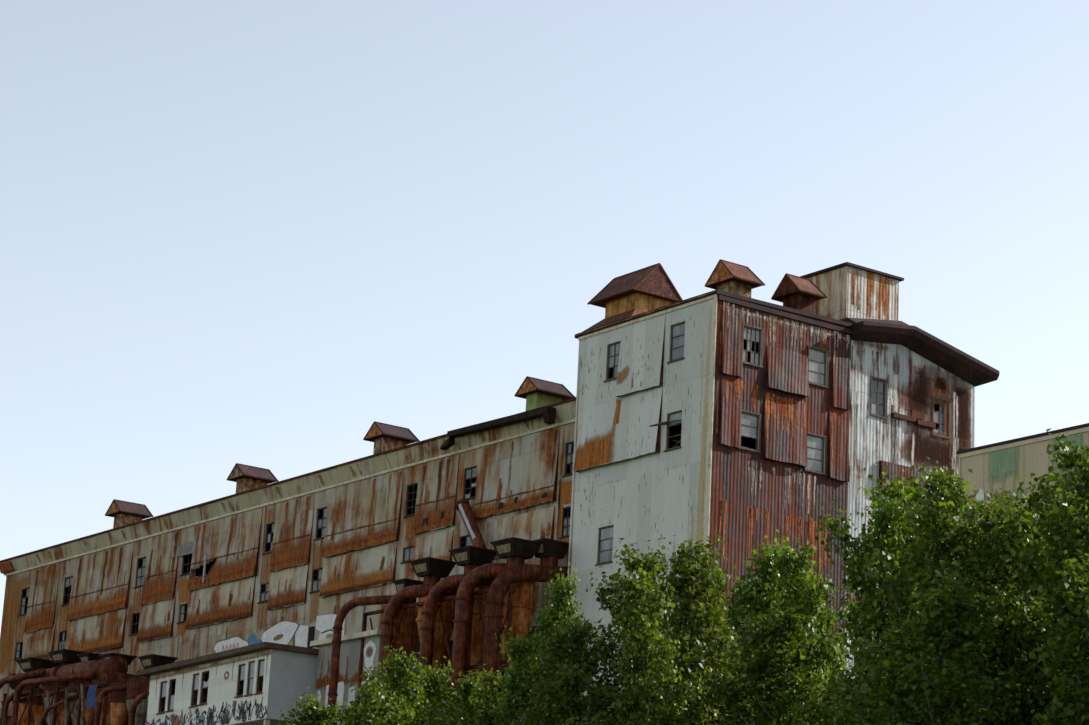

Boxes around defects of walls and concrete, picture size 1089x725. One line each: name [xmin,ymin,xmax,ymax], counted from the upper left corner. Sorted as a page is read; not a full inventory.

rust [851,274,887,315]
rust [716,379,806,443]
rust [830,411,846,459]
damp [888,374,914,465]
rust [473,389,621,575]
rust [0,440,454,673]
rust [719,499,732,555]
rust [747,461,828,583]
rust [316,657,376,688]